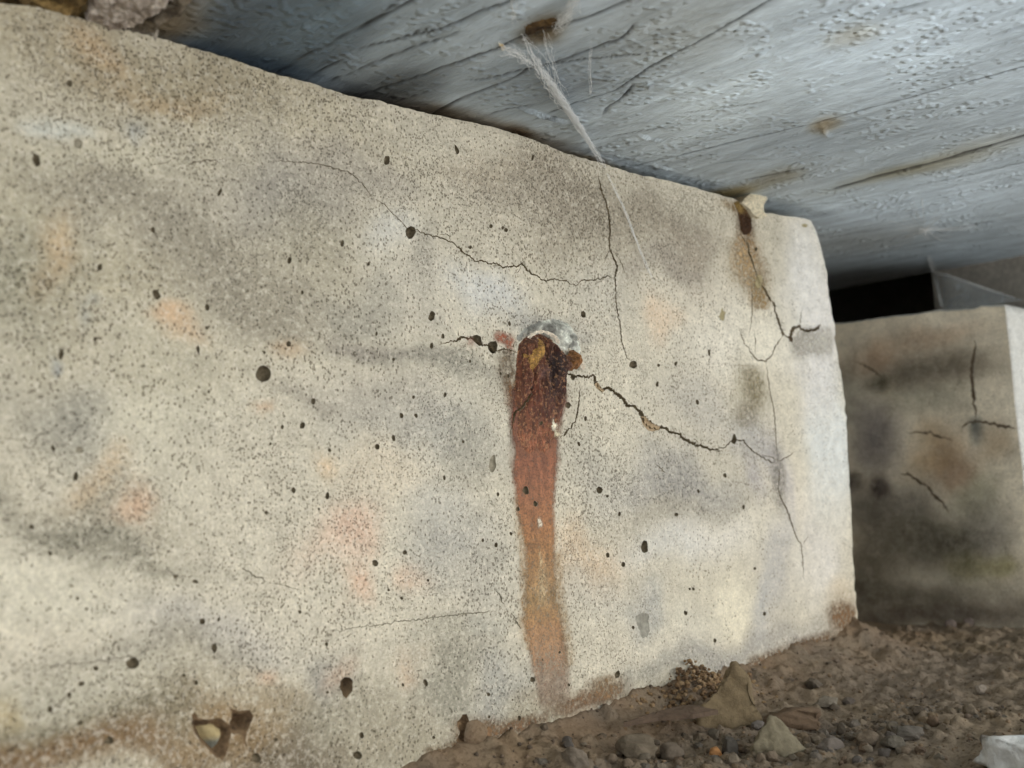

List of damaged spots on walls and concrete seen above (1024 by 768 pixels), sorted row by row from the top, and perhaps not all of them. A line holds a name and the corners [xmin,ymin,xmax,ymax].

crack [280,160,628,359]
rust [495,333,583,698]
crack [559,236,821,578]
crack [900,472,949,513]
crack [905,340,1015,440]
spalling [191,706,253,761]